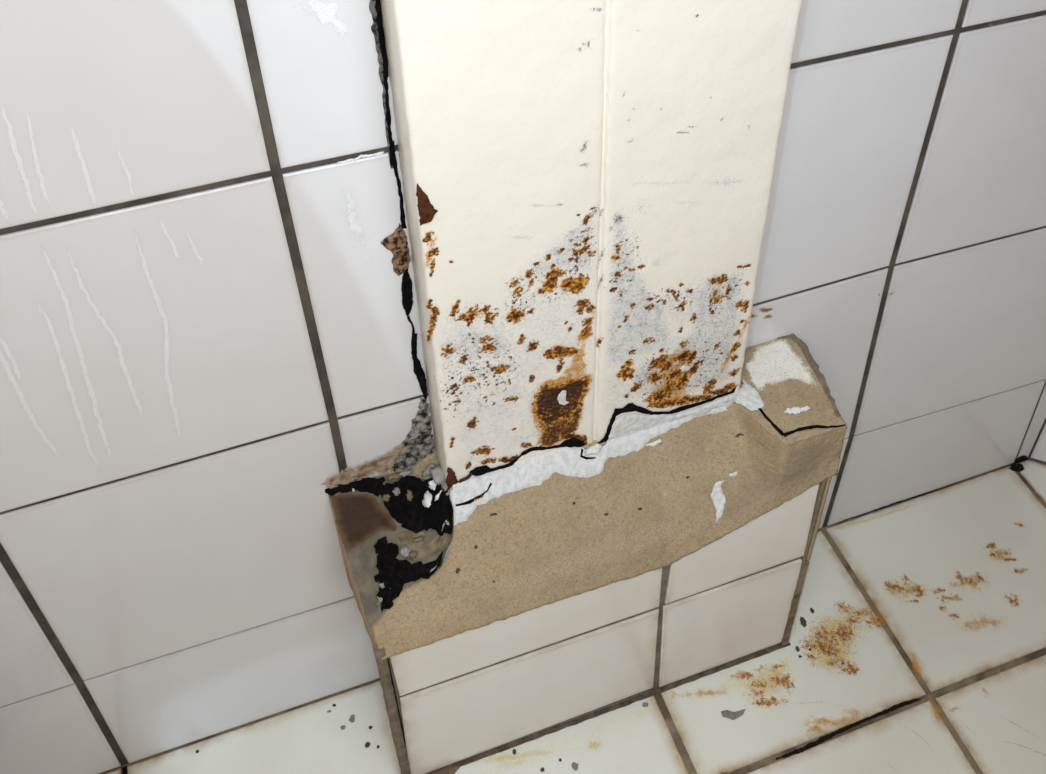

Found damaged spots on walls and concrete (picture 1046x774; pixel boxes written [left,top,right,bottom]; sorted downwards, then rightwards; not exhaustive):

rust [416,183,454,277]
rust [426,207,752,506]
spalling [322,200,749,628]
crack [734,382,846,437]
rust [884,571,1007,634]
rust [986,543,1028,574]
rust [672,602,886,710]
rust [802,705,867,735]